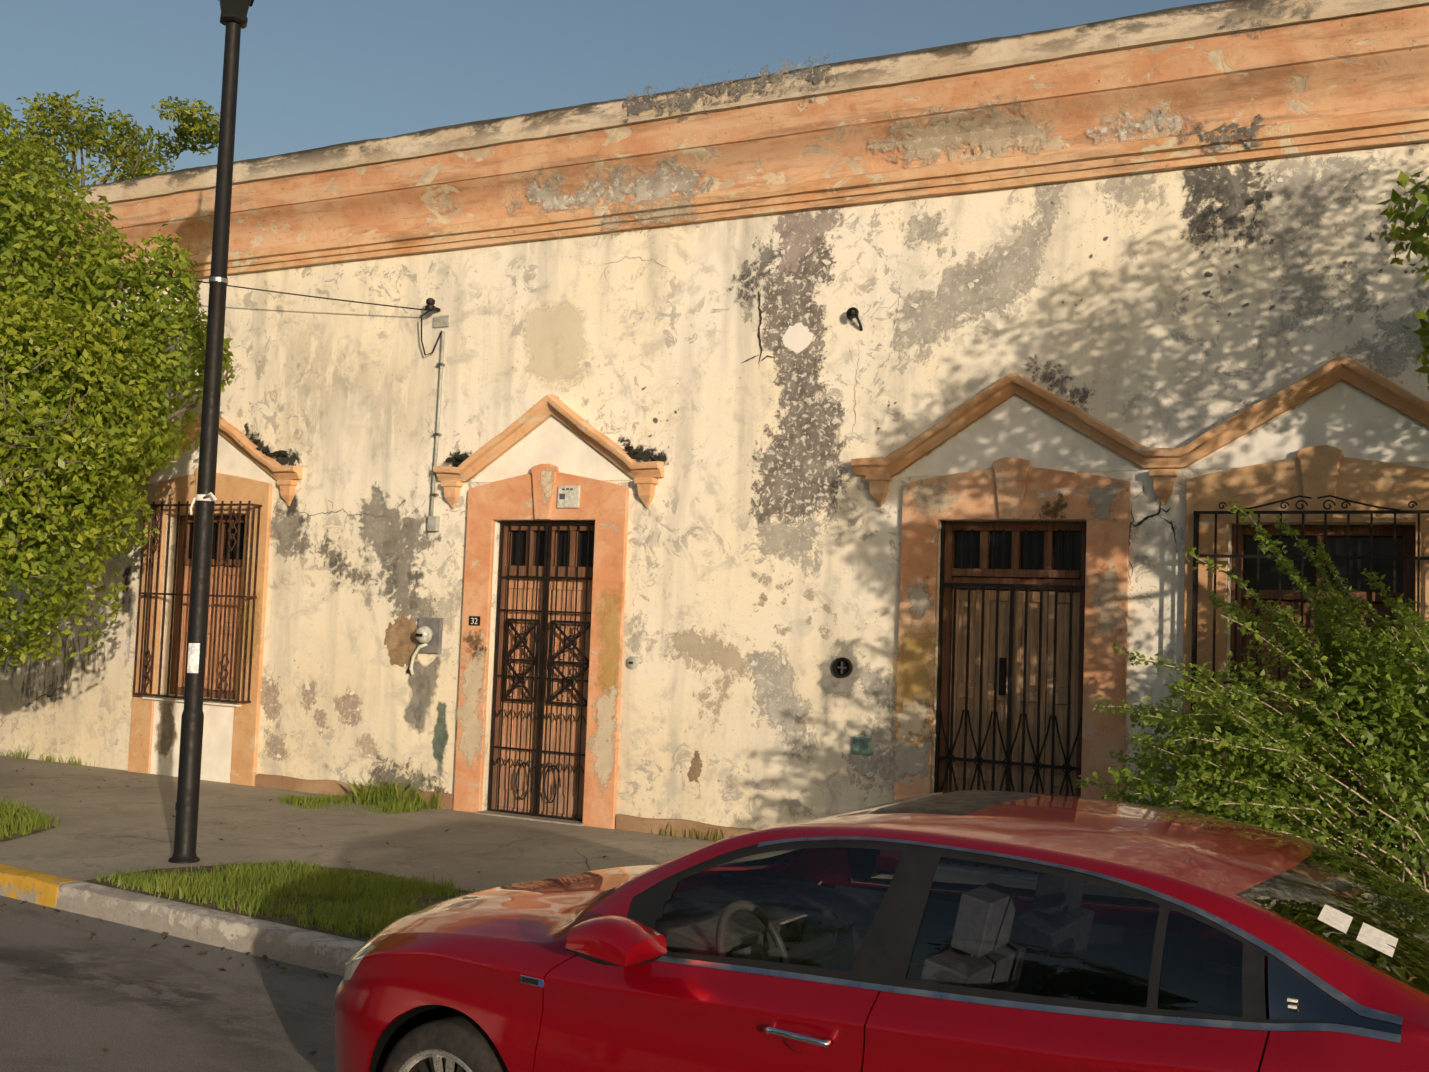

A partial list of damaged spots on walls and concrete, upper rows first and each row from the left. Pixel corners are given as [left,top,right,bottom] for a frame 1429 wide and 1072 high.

flaking render [867,94,1069,168]
flaking render [1085,106,1192,145]
flaking render [880,182,1067,363]
flaking render [1257,155,1429,384]
flaking render [747,207,849,640]
crack [1129,486,1177,584]
flaking render [665,625,817,763]
peeling [842,575,936,802]